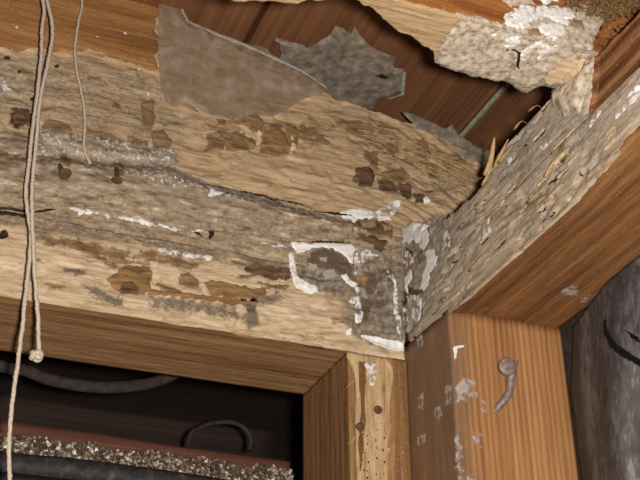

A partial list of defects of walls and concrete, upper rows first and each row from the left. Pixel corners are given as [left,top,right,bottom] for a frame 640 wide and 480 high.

peeling [158,4,330,156]
peeling [437,0,603,88]
peeling [107,151,431,335]
crack [208,184,352,216]
crack [296,237,350,245]
water stain [240,213,452,341]
peeling [337,120,377,136]
peeling [416,138,438,178]
peeling [361,222,506,351]
peeling [519,128,578,222]